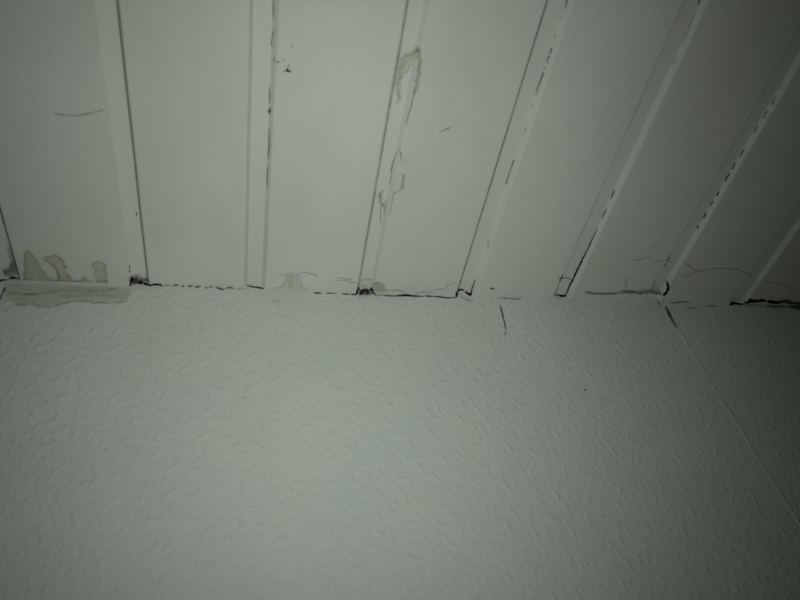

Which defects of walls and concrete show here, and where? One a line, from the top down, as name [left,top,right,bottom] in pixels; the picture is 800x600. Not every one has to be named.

crack [148,282,264,290]
crack [282,272,475,299]
crack [588,243,797,328]
crack [499,297,521,337]